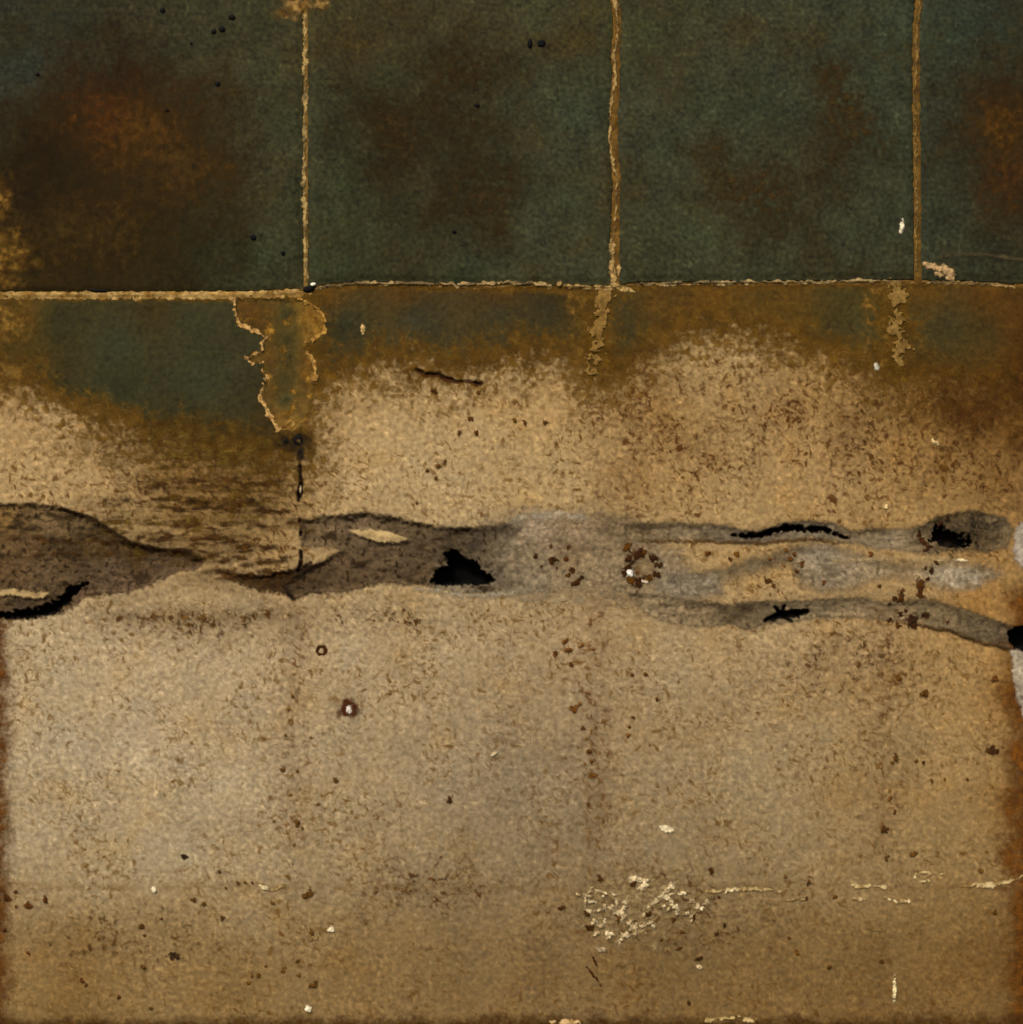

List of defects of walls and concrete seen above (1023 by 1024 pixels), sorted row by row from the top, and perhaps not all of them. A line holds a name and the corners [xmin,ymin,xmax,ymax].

peeling [232,0,900,460]
crack [415,368,482,387]
rust [616,369,705,460]
rust [826,352,964,465]
rust [922,441,1020,501]
water stain [137,476,293,582]
crack [296,465,304,572]
spalling [216,511,585,600]
crack [731,524,848,539]
spalling [625,511,1023,567]
crack [764,605,809,623]
water stain [573,868,710,950]